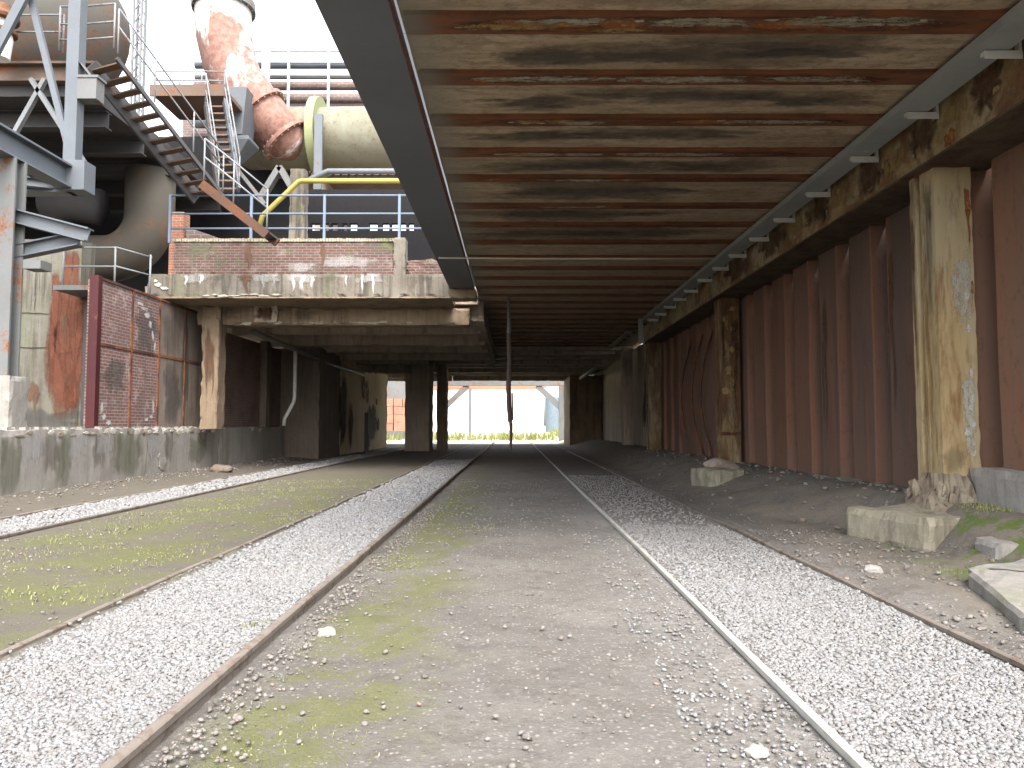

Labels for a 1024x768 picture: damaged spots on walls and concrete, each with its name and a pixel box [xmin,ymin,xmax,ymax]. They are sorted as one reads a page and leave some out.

damp [505,52,699,63]
corrosion [468,75,888,85]
corrosion [464,17,959,33]
corrosion [388,0,470,274]
corrosion [28,250,85,416]
peeling [950,247,974,333]
peeling [962,367,977,457]